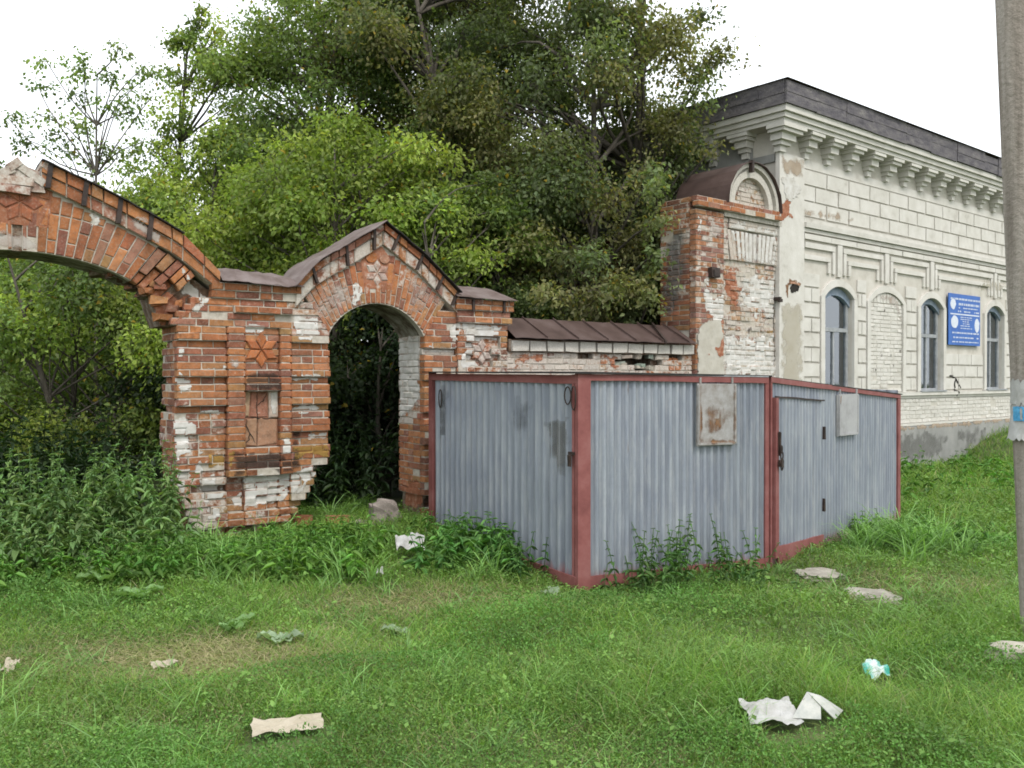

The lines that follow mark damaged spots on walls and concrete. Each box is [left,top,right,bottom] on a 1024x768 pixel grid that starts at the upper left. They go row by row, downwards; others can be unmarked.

peeling [697,174,840,320]
flaking render [519,353,544,367]
flaking render [605,354,654,370]
peeling [715,334,776,377]
corrosion [700,389,736,444]
water stain [549,422,565,466]
peeling [173,417,320,519]